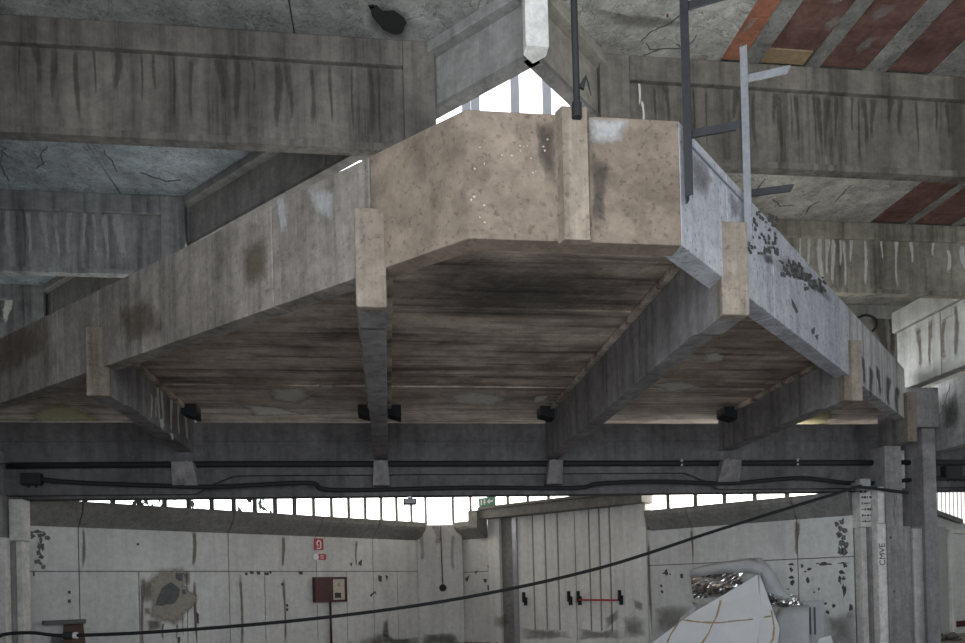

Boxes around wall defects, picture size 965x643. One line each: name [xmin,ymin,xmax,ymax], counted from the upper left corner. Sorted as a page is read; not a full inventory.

crack [640,15,697,56]
crack [140,172,181,182]
leakage [26,212,126,255]
peeling [748,211,826,293]
leakage [794,238,868,291]
leakage [880,241,914,284]
leakage [946,245,965,272]
leakage [916,310,959,364]
peeling [30,530,50,576]
peeling [787,518,853,615]
spalling [155,573,187,606]